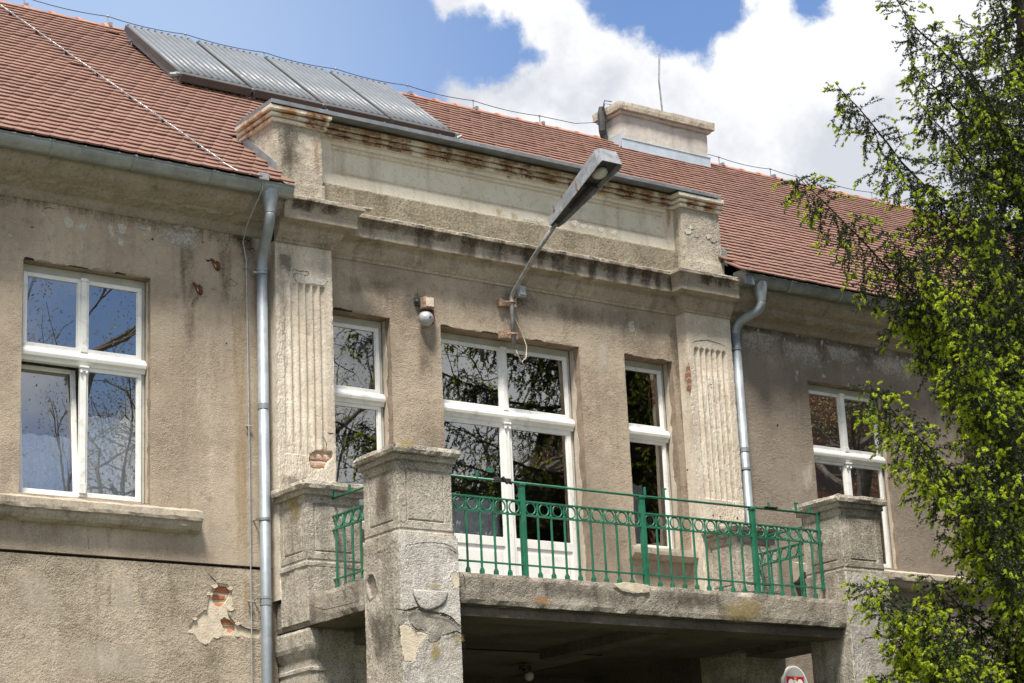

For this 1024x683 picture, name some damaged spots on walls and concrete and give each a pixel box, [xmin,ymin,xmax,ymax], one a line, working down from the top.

corrosion [280,106,411,155]
corrosion [424,144,576,187]
corrosion [597,183,669,216]
water stain [363,220,672,289]
spalling [309,449,331,471]
peeling [625,353,688,549]
spalling [188,583,259,645]
spalling [395,609,461,662]